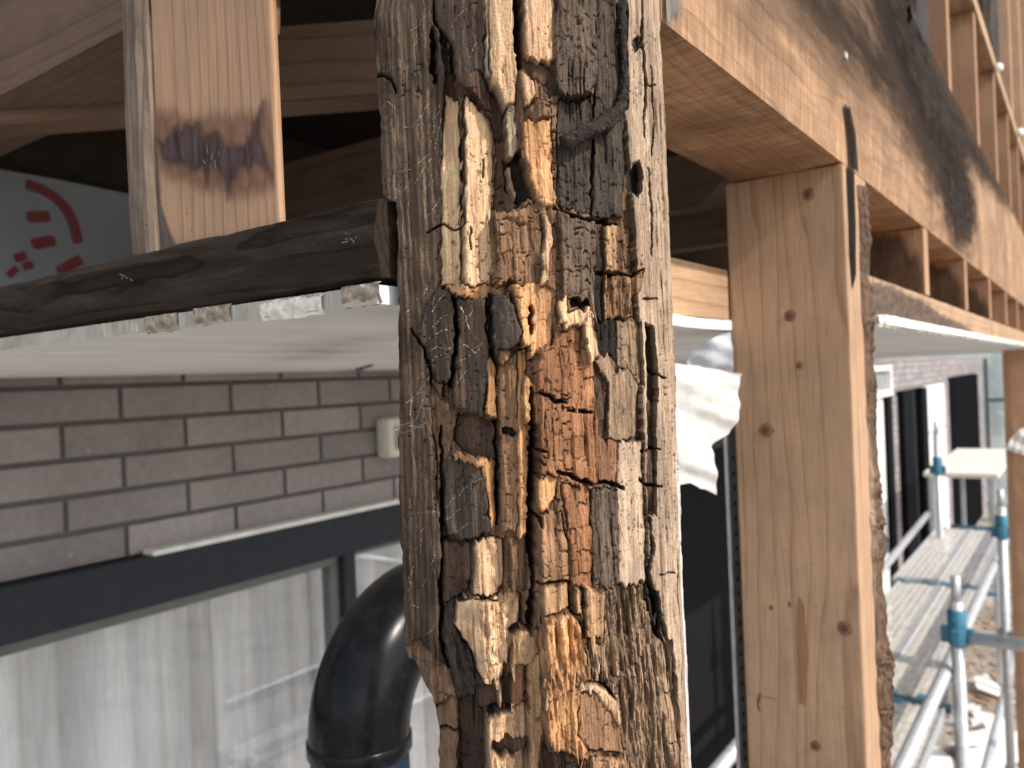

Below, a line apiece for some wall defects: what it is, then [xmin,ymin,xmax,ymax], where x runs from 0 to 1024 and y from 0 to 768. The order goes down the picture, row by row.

damp [155,103,274,248]
crack [428,0,485,250]
crack [512,0,524,71]
spalling [520,55,558,100]
crack [594,0,658,300]
damp [758,0,1010,246]
crack [411,293,461,388]
crack [437,425,499,670]
crack [526,307,534,335]
spalling [406,70,681,768]
crack [492,386,663,640]
crack [644,516,675,636]